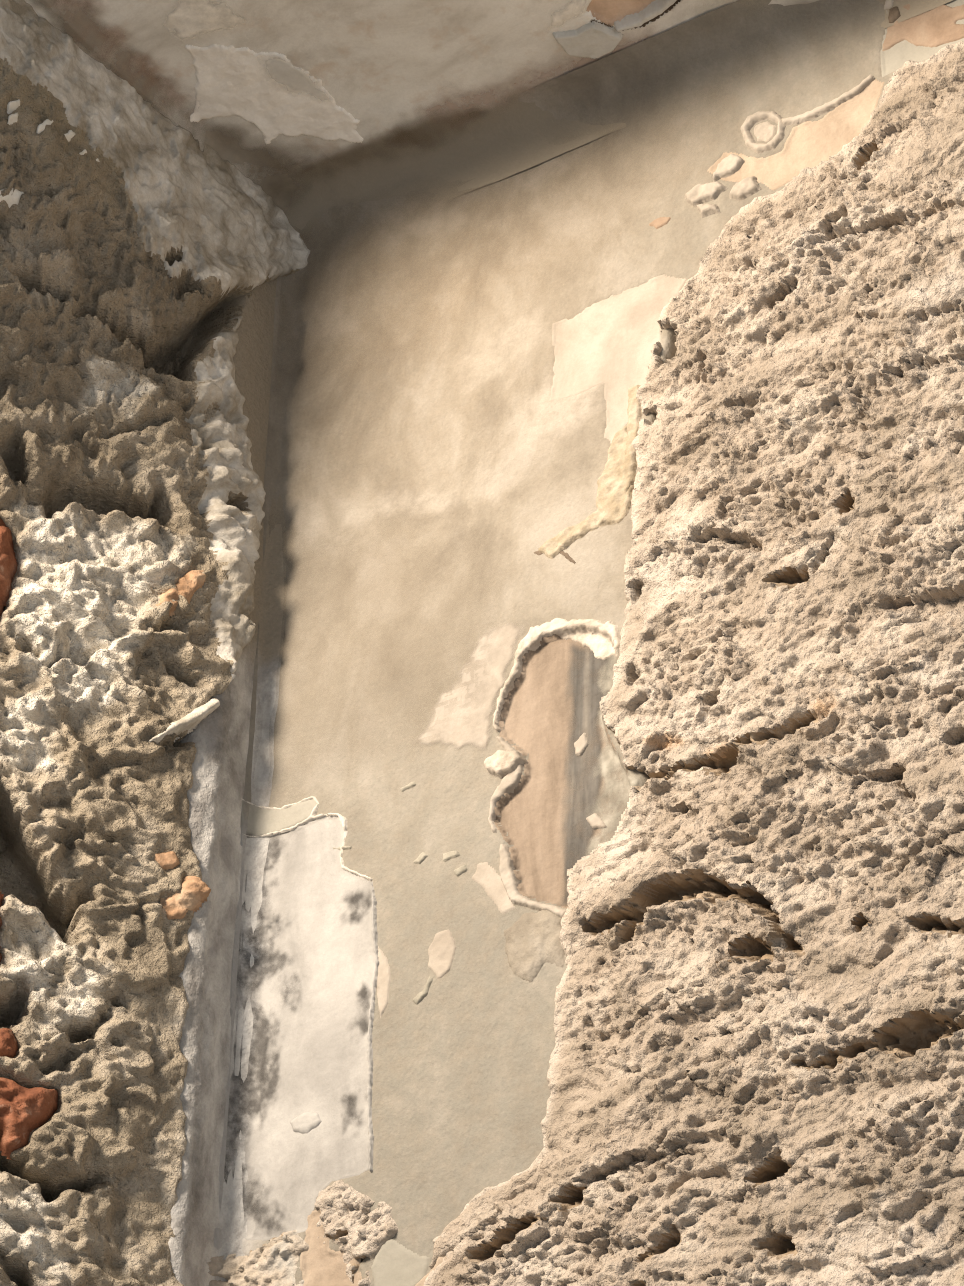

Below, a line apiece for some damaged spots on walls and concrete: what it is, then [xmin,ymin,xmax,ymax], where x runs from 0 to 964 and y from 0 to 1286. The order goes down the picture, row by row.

spalling [0,0,364,1286]
spalling [207,0,964,1286]
damp [237,839,285,987]
damp [349,893,370,921]
damp [358,987,368,1032]
damp [225,1002,278,1182]
damp [345,1095,356,1116]
damp [242,1182,280,1229]